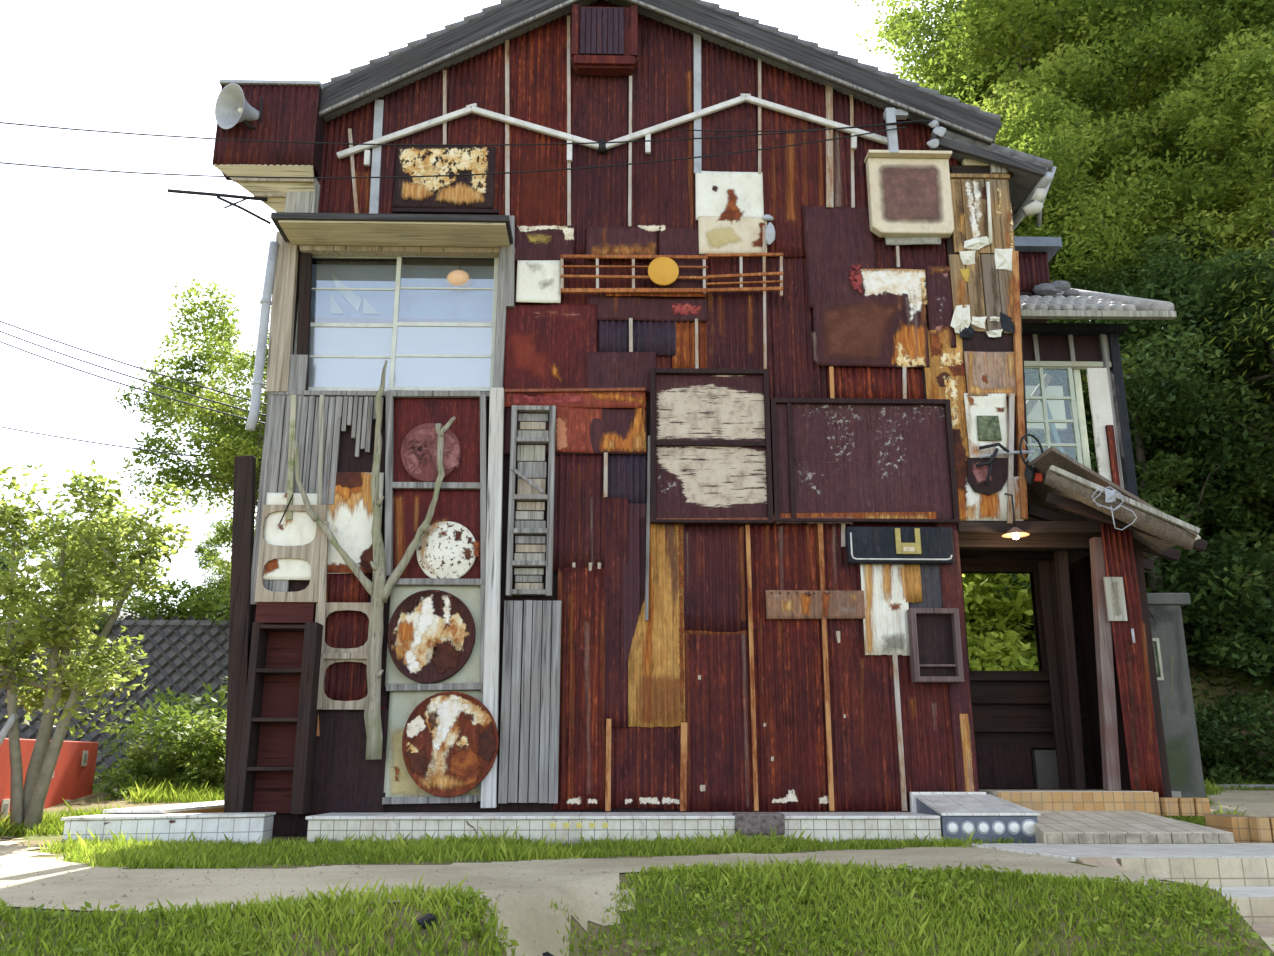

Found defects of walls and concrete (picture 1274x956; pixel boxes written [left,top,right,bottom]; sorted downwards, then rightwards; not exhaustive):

peeling [400,147,489,203]
rust [707,189,765,247]
rust [513,392,646,452]
peeling [656,375,767,508]
peeling [877,405,944,478]
rust [824,304,1020,520]
rust [432,643,462,674]
rust [637,524,744,723]
rust [777,592,829,617]
rust [845,564,907,654]
rust [405,749,430,777]
rust [450,714,496,787]